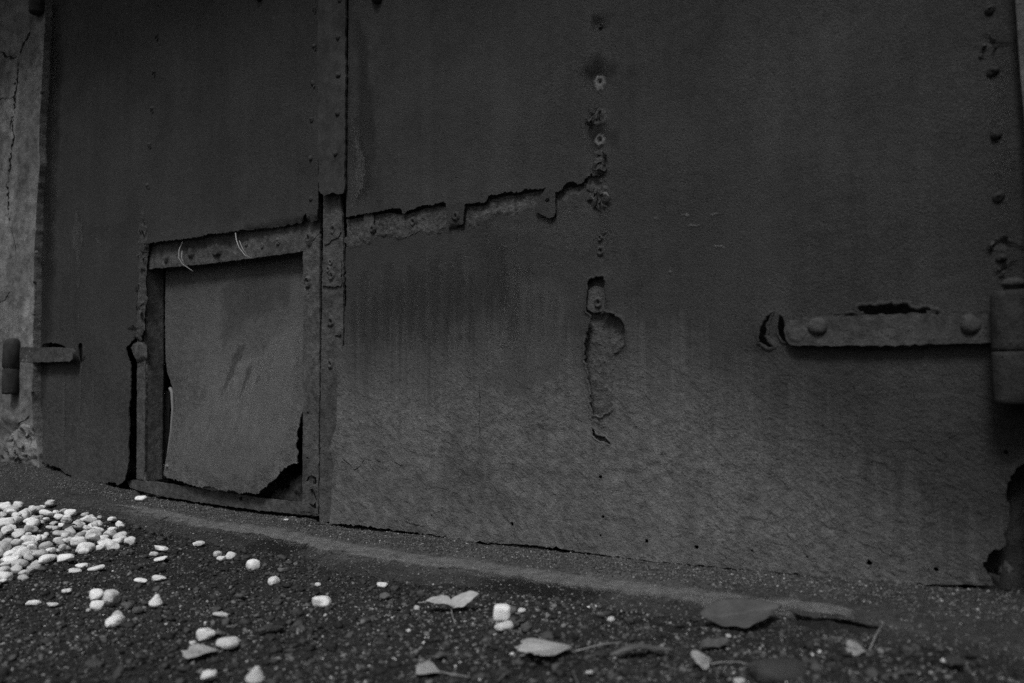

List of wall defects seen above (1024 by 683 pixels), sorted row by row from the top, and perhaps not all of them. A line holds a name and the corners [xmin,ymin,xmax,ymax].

crack [0,32,31,250]